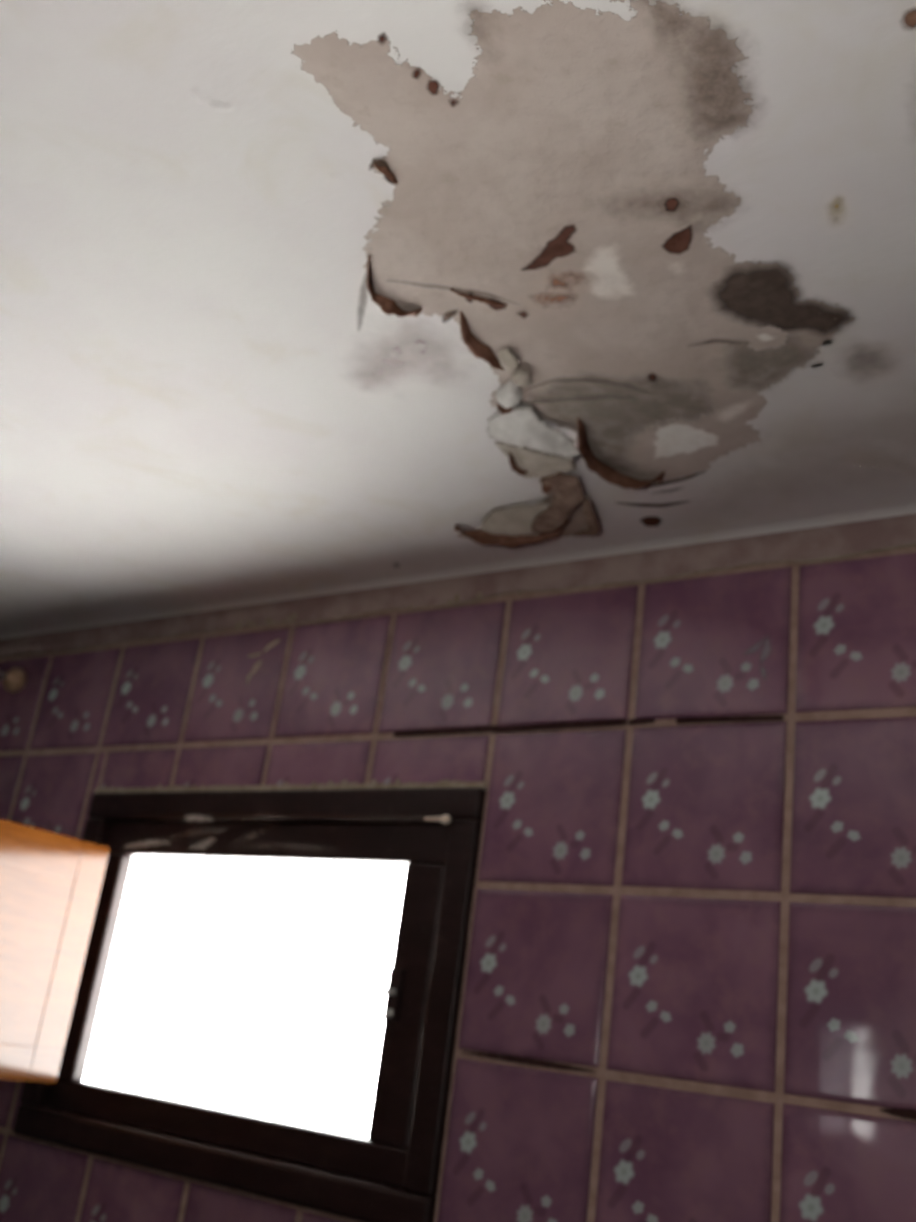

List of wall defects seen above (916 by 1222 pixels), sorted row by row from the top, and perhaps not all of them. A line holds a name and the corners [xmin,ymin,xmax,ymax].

spalling [903,9,916,29]
flaking render [291,0,856,548]
crack [393,715,784,737]